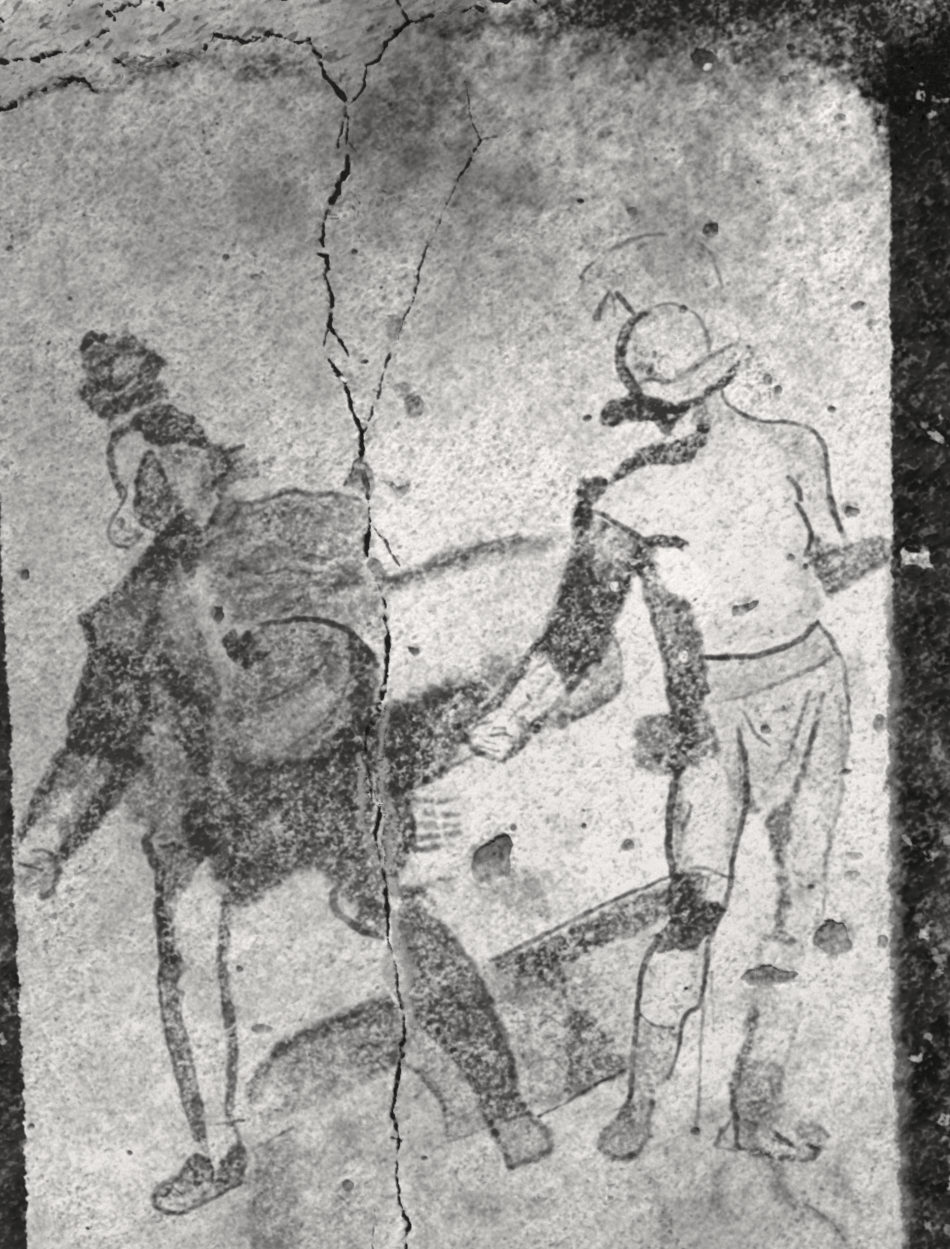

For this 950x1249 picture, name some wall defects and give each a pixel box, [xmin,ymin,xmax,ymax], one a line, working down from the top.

crack [0,0,537,1249]
spalling [473,824,516,871]